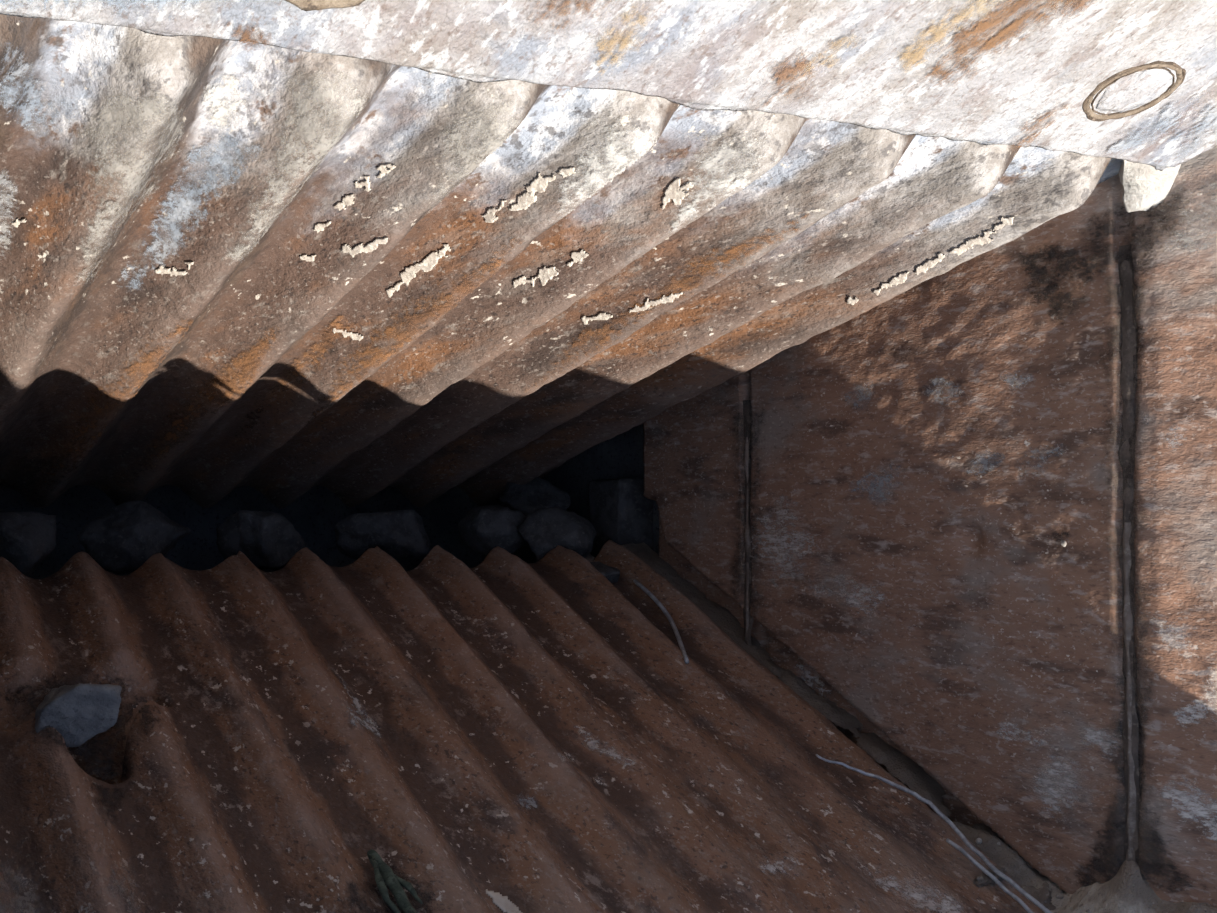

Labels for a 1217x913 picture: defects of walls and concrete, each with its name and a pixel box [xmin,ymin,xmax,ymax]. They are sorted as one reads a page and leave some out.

rust [227,24,266,50]
rust [766,37,852,104]
rust [900,0,1097,85]
rust [1012,107,1068,148]
peeling [313,163,396,233]
peeling [481,167,576,223]
peeling [662,178,694,210]
peeling [340,237,388,258]
peeling [386,244,451,297]
peeling [513,249,589,288]
rust [535,215,808,386]
leakage [1019,252,1093,320]